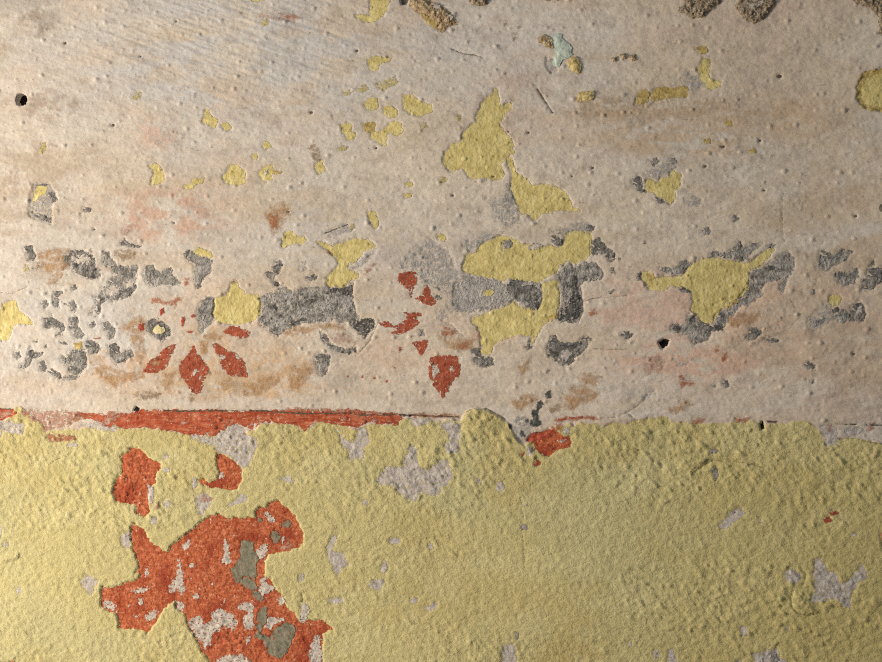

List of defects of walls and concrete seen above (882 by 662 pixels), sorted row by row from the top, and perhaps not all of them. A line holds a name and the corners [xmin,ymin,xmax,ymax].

flaking render [678,0,721,19]
flaking render [735,0,776,24]
peeling [856,68,882,112]
peeling [24,245,36,261]
peeling [0,250,181,381]
peeling [181,224,394,339]
peeling [400,88,617,368]
peeling [636,241,795,348]
peeling [809,249,882,329]
peeling [375,418,461,501]
peeling [526,424,571,466]
peeling [81,422,333,662]